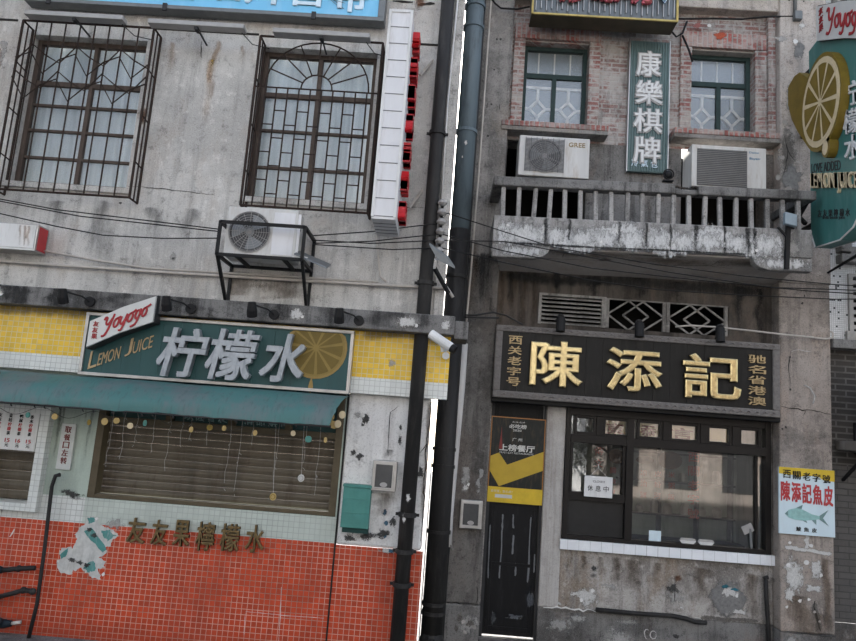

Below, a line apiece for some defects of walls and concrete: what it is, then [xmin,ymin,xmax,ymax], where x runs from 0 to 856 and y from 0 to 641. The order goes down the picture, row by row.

damp [513,218,757,265]
peeling [344,494,411,541]
peeling [491,584,647,625]
peeling [665,576,683,609]
spalling [694,609,758,623]
peeling [782,541,824,631]